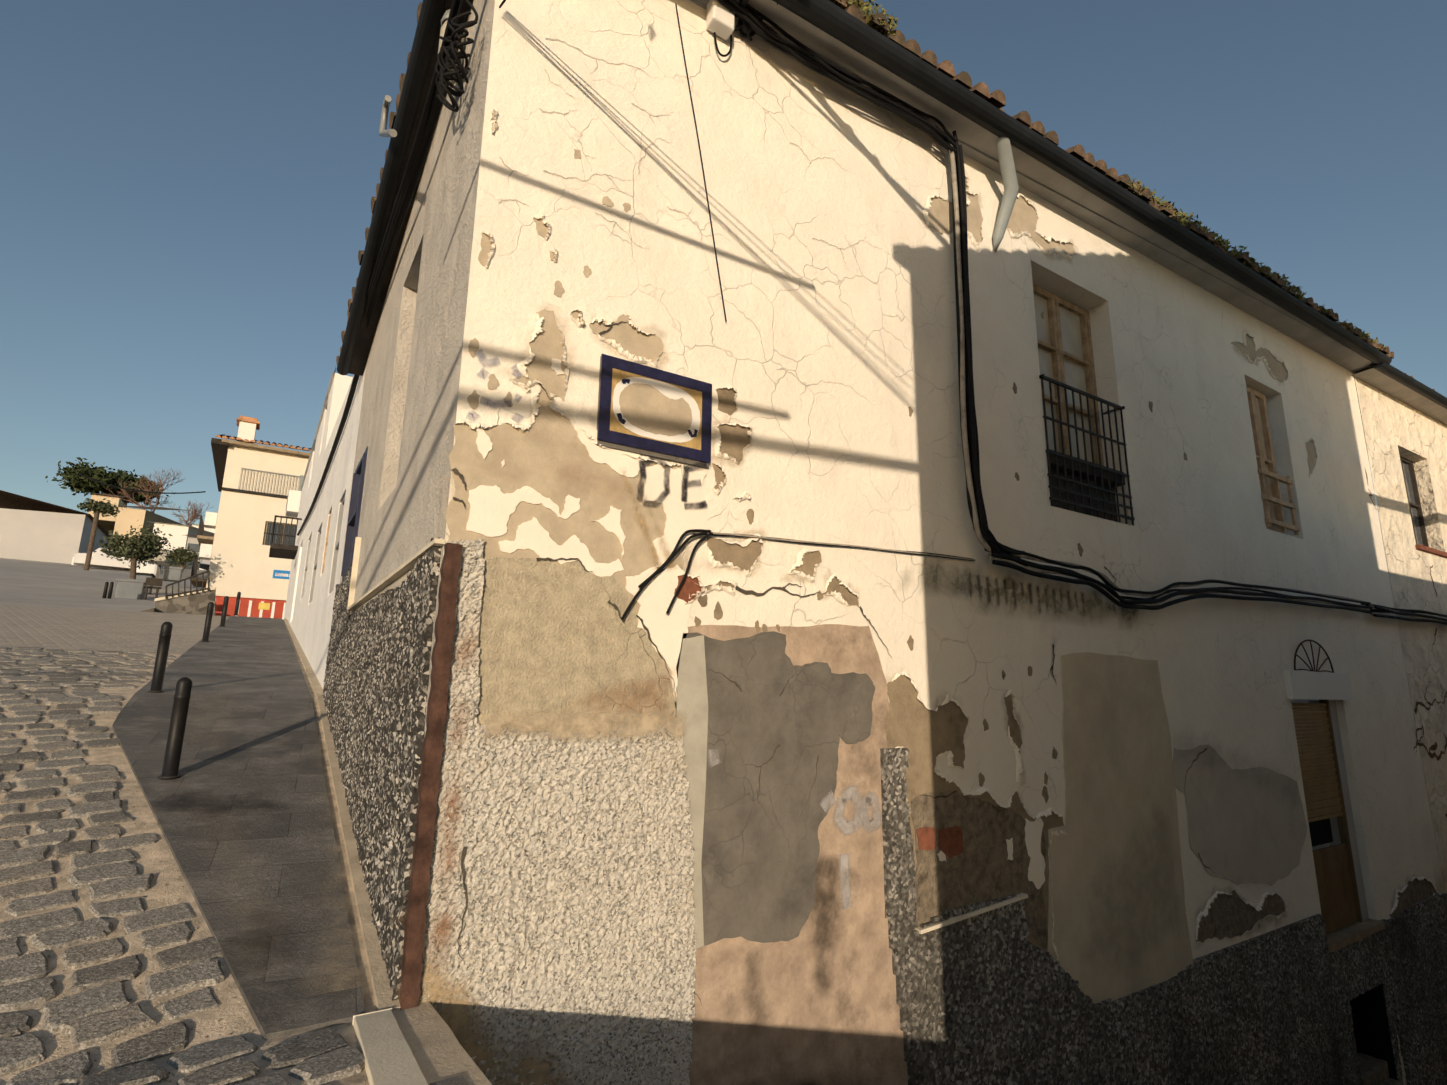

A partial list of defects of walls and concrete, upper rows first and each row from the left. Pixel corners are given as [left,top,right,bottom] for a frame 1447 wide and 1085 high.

crack [498,38,669,248]
peeling [478,232,496,269]
crack [812,238,892,264]
peeling [923,175,983,251]
peeling [1003,192,1077,260]
crack [598,321,629,336]
peeling [445,280,763,707]
crack [735,583,822,597]
water stain [932,567,1137,621]
crack [859,606,891,656]
peeling [885,670,1067,961]
peeling [1195,890,1289,943]